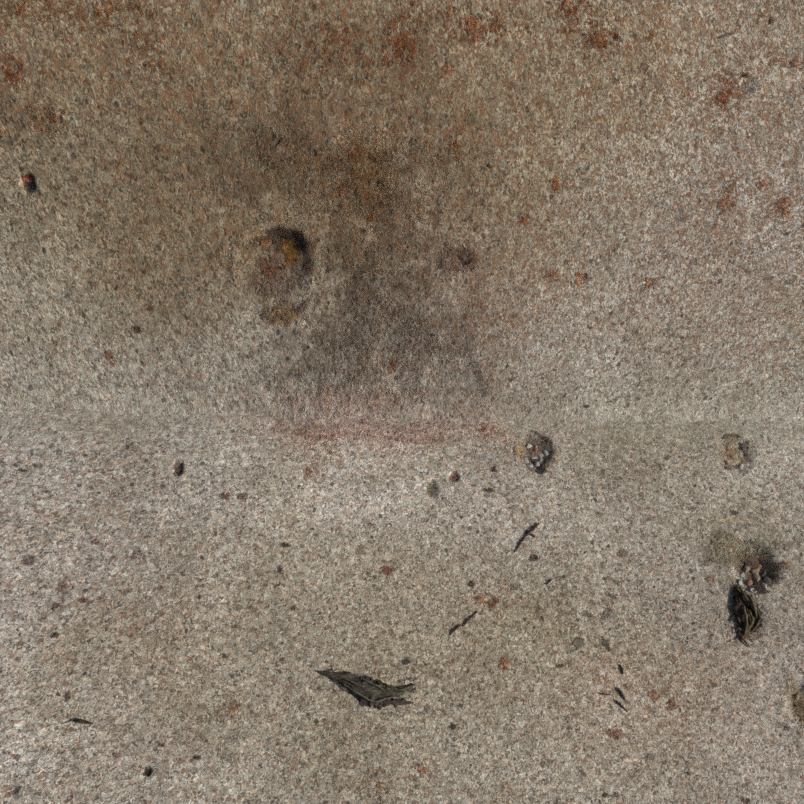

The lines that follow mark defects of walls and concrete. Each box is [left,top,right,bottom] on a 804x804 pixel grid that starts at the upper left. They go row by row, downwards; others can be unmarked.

damp [318,241,453,398]
damp [293,388,448,458]